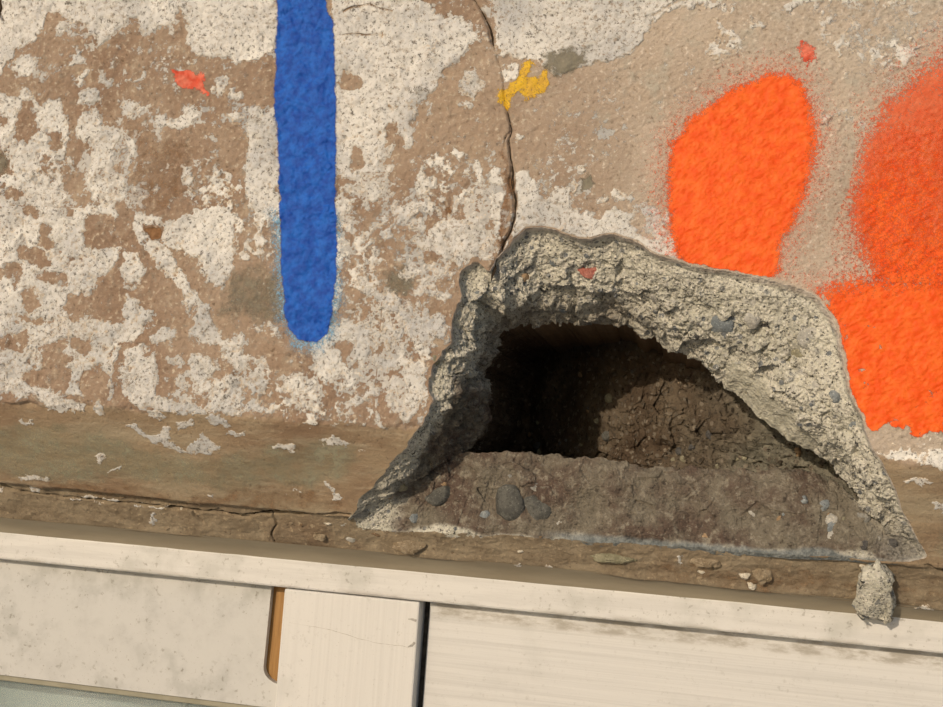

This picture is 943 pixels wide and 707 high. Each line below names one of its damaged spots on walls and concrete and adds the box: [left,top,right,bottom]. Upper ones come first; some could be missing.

crack [474,0,504,86]
crack [491,112,517,281]
spalling [0,0,943,565]